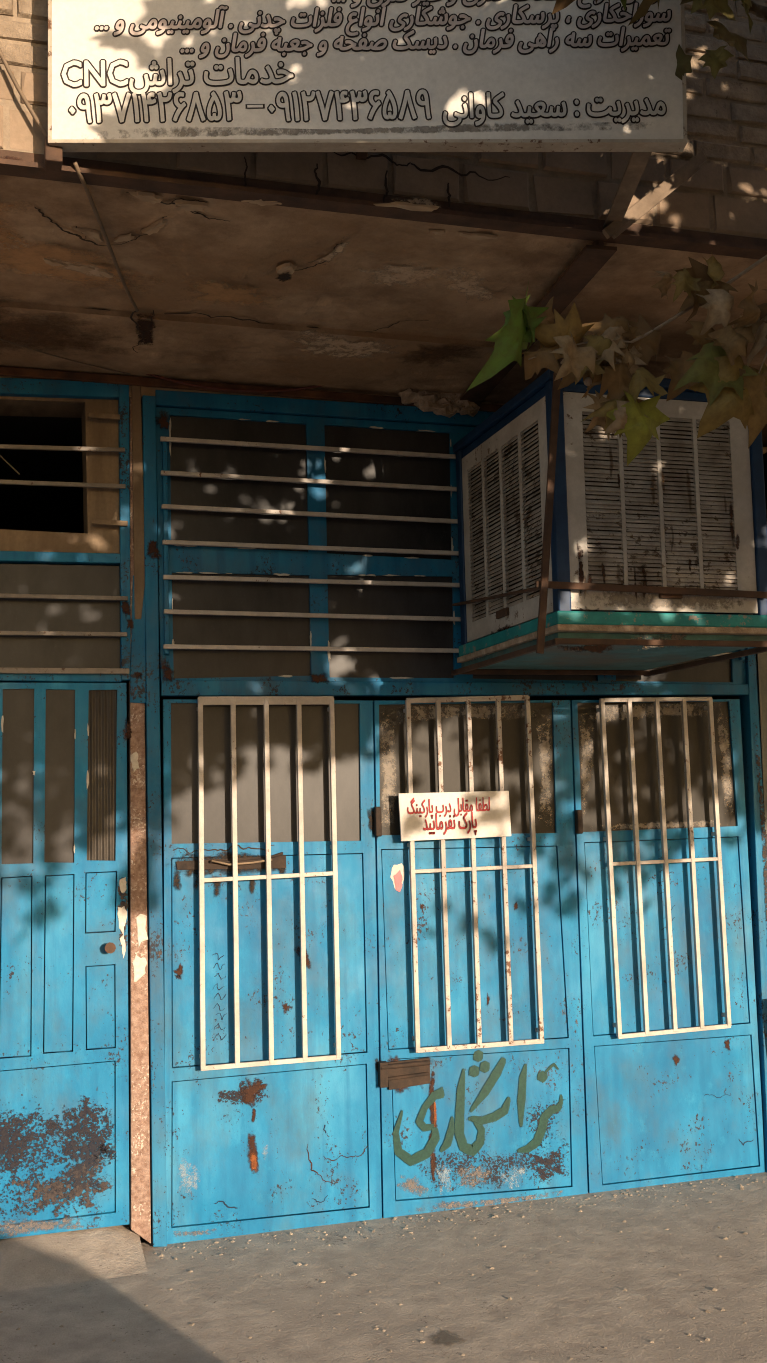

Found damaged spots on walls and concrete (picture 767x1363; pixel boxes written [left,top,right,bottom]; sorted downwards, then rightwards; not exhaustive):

crack [34,207,167,246]
spalling [275,243,348,282]
spalling [398,388,480,418]
corrosion [724,501,740,549]
corrosion [577,543,741,611]
peeling [130,752,139,771]
peeling [117,876,148,982]
corrosion [212,1078,270,1172]